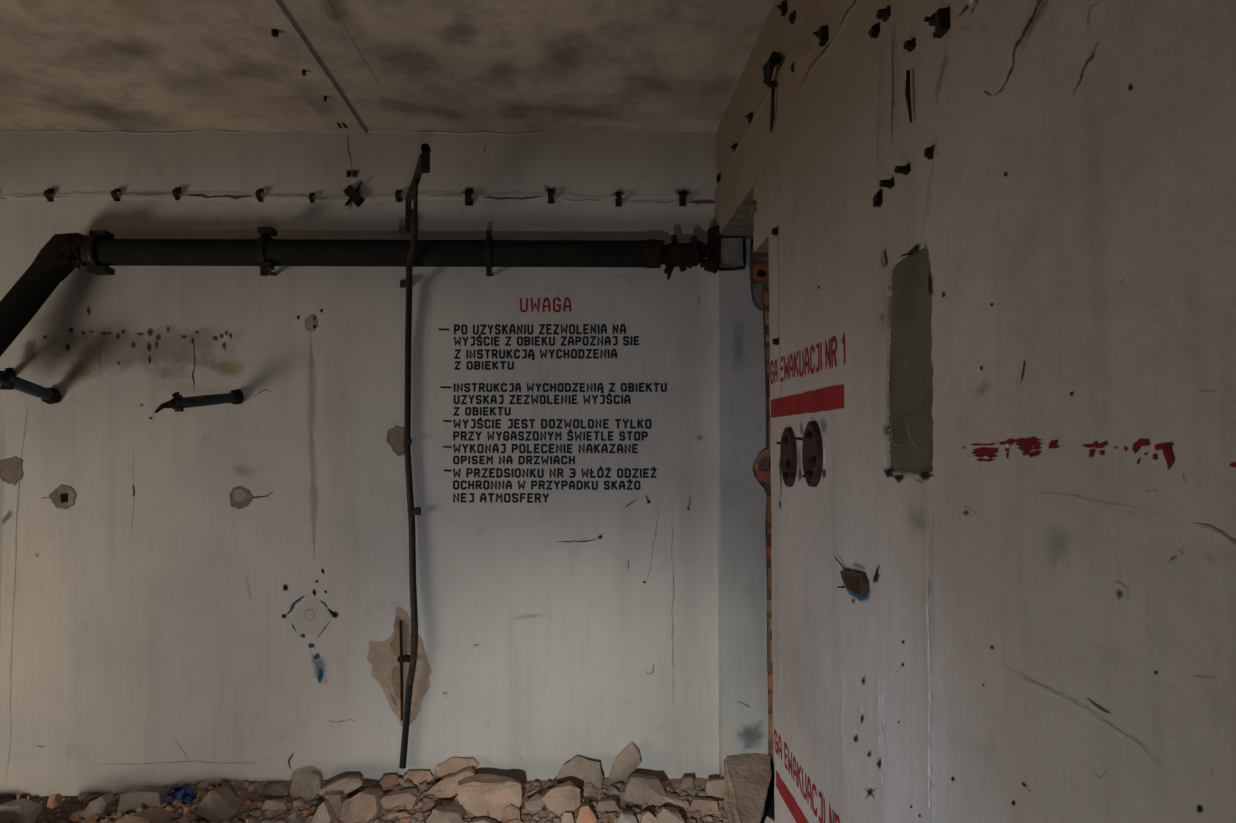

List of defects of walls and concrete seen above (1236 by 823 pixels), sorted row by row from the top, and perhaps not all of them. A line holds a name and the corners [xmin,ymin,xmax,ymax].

crack [955,0,978,18]
crack [983,0,1041,96]
flaking render [386,426,404,456]
flaking render [0,456,24,486]
flaking render [49,484,77,510]
flaking render [229,486,273,510]
flaking render [367,607,432,727]